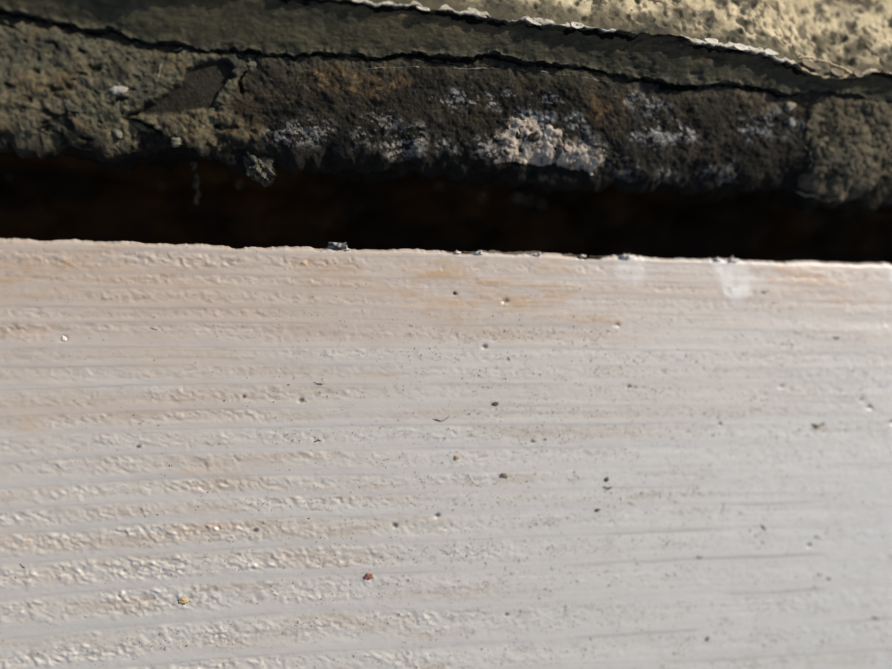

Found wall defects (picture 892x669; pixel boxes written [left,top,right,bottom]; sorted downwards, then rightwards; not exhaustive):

crack [280,0,638,42]
peeling [352,0,637,34]
crack [0,10,807,98]
peeling [680,35,892,79]
efflorescence [258,75,810,188]